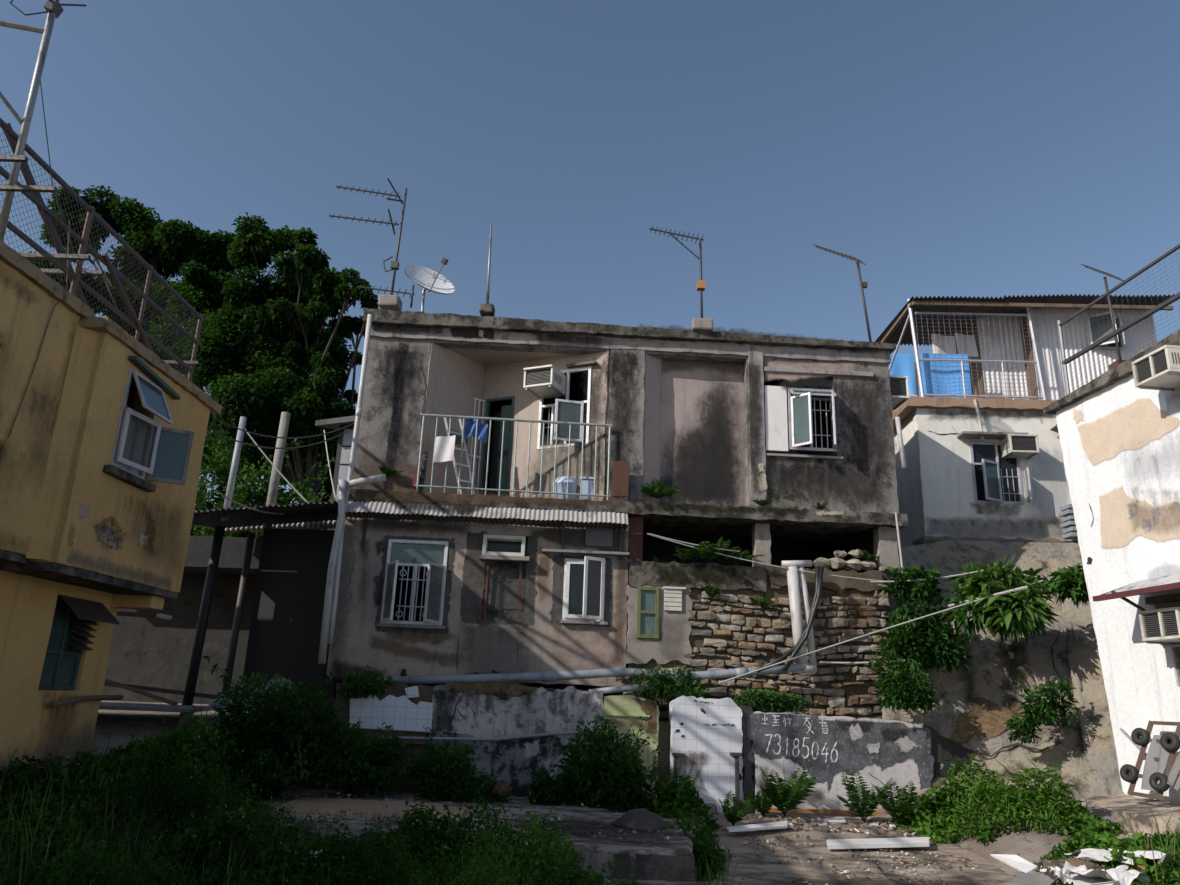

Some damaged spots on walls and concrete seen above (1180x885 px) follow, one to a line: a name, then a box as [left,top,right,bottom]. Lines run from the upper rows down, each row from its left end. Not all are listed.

leakage [377,350,422,452]
leakage [661,364,896,509]
peeling [1073,398,1180,465]
peeling [1099,486,1180,548]
spalling [445,669,538,701]
peeling [523,735,583,780]
peeling [847,723,880,754]
peeling [895,736,918,752]
crack [944,742,1063,776]